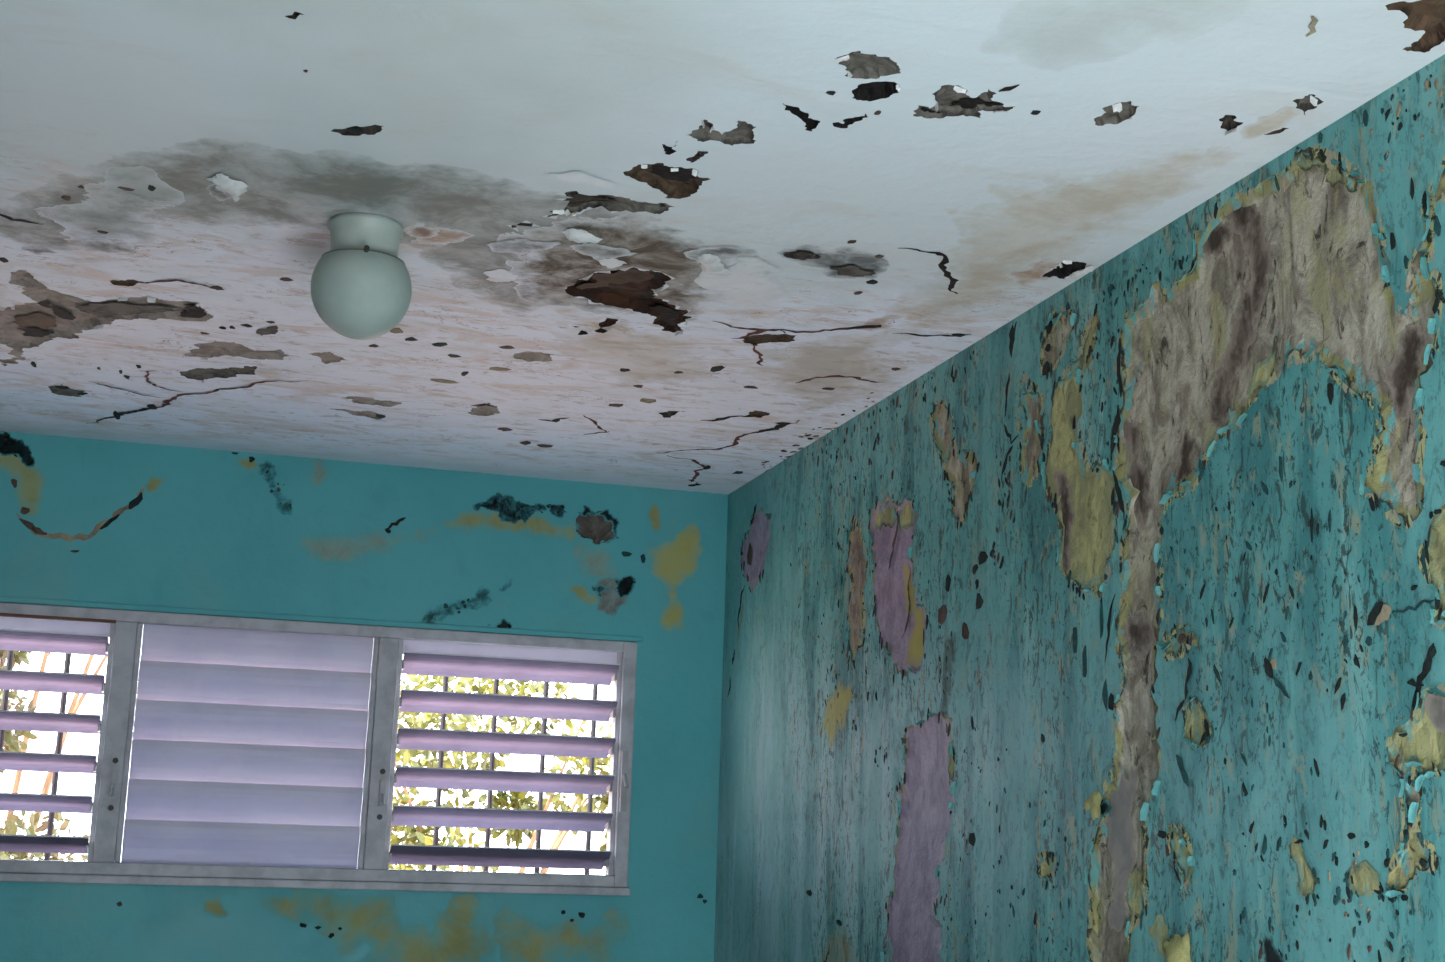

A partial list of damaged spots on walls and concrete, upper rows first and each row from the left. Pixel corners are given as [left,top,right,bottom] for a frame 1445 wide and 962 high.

spalling [1385,0,1445,53]
spalling [913,85,1041,119]
crack [0,214,43,225]
spalling [0,270,297,383]
leakage [0,137,784,389]
spalling [777,240,890,295]
crack [714,315,971,366]
crack [899,248,959,294]
leakage [742,145,1243,410]
leakage [992,321,1018,569]
leakage [1095,329,1125,517]
peeling [1015,74,1445,962]